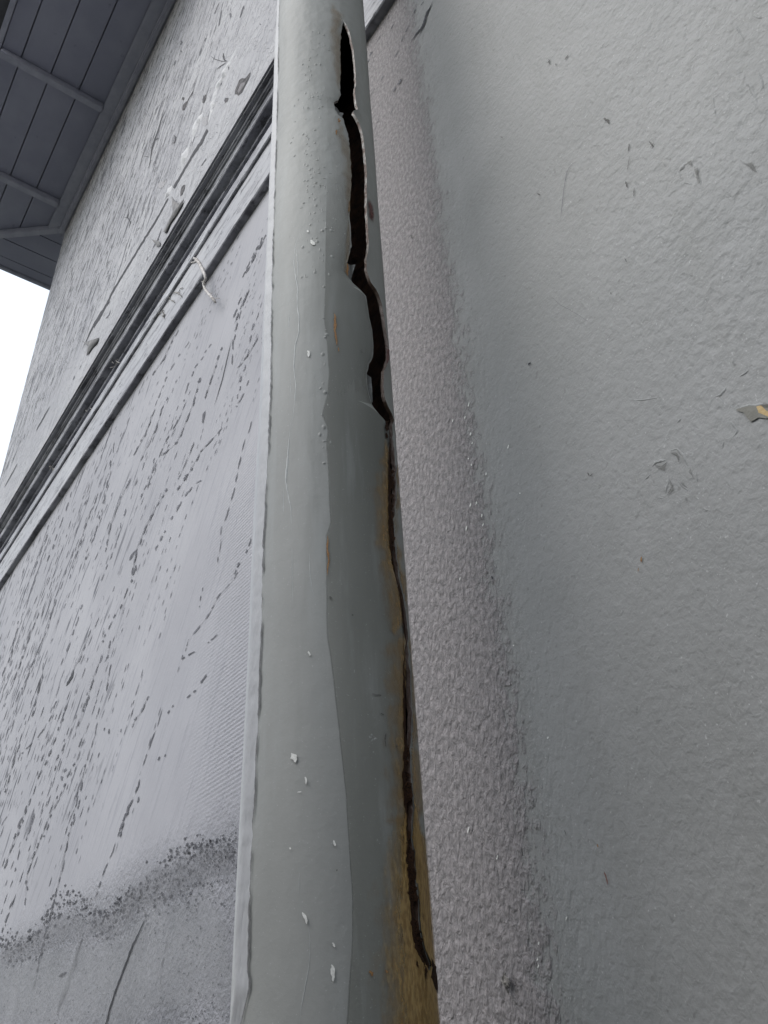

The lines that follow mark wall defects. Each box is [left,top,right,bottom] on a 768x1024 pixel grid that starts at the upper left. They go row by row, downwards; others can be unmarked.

crack [370,1,433,121]
crack [347,264,355,281]
crack [367,349,438,993]
rust [369,446,440,1024]
mould [0,826,238,1024]